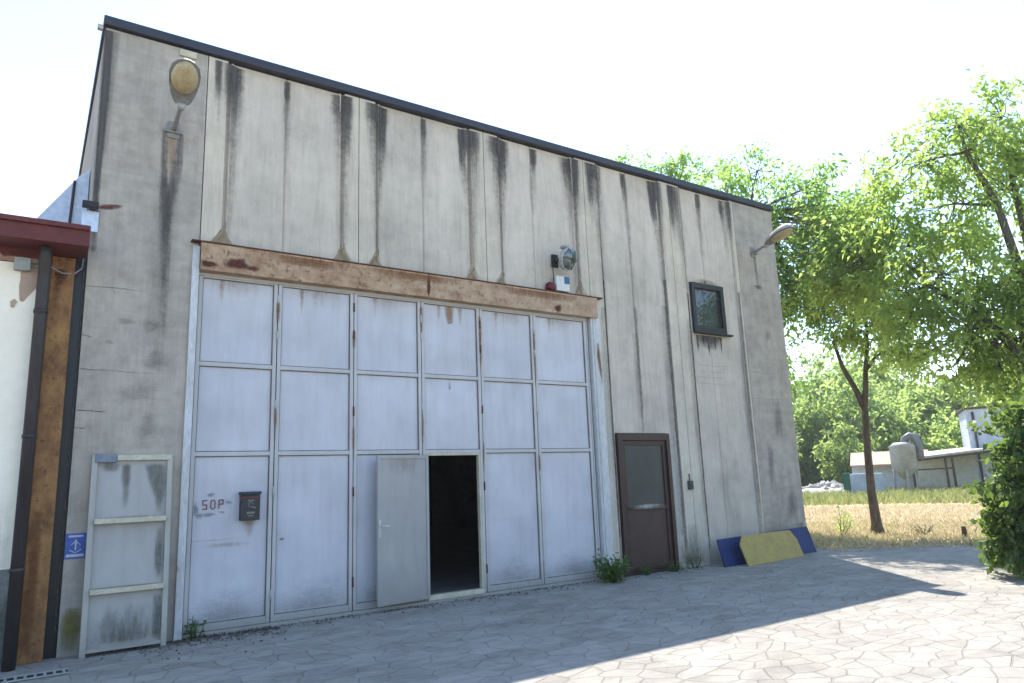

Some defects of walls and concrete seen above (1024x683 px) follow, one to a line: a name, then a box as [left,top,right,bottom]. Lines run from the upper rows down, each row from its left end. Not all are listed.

water stain [93,29,113,212]
water stain [334,95,351,143]
water stain [368,102,386,148]
water stain [458,129,478,163]
water stain [490,136,505,175]
water stain [162,134,182,265]
water stain [563,158,600,198]
water stain [648,181,678,224]
rust [203,259,259,271]
rust [399,272,440,293]